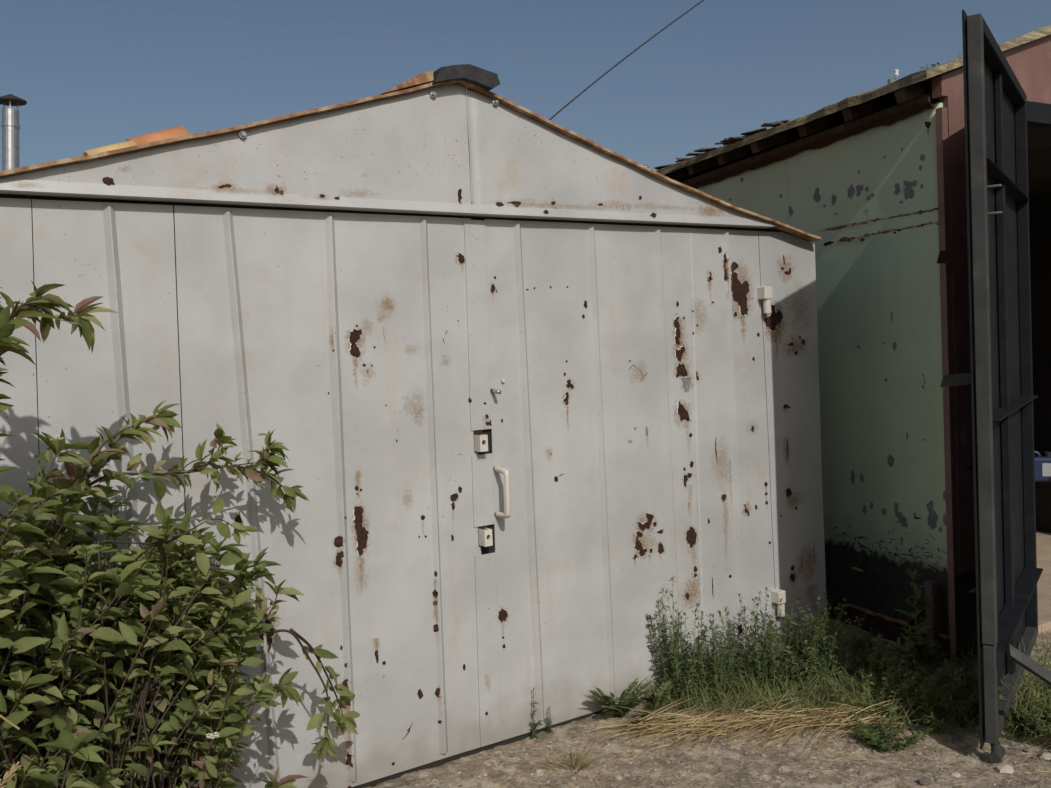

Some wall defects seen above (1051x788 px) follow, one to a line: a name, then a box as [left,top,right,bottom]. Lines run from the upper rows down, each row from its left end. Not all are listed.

peeling [813,170,875,215]
corrosion [824,207,938,246]
corrosion [348,325,373,373]
corrosion [757,304,805,355]
corrosion [677,400,692,438]
corrosion [334,473,369,567]
corrosion [633,513,665,559]
peeling [862,491,946,532]
corrosion [834,603,926,647]